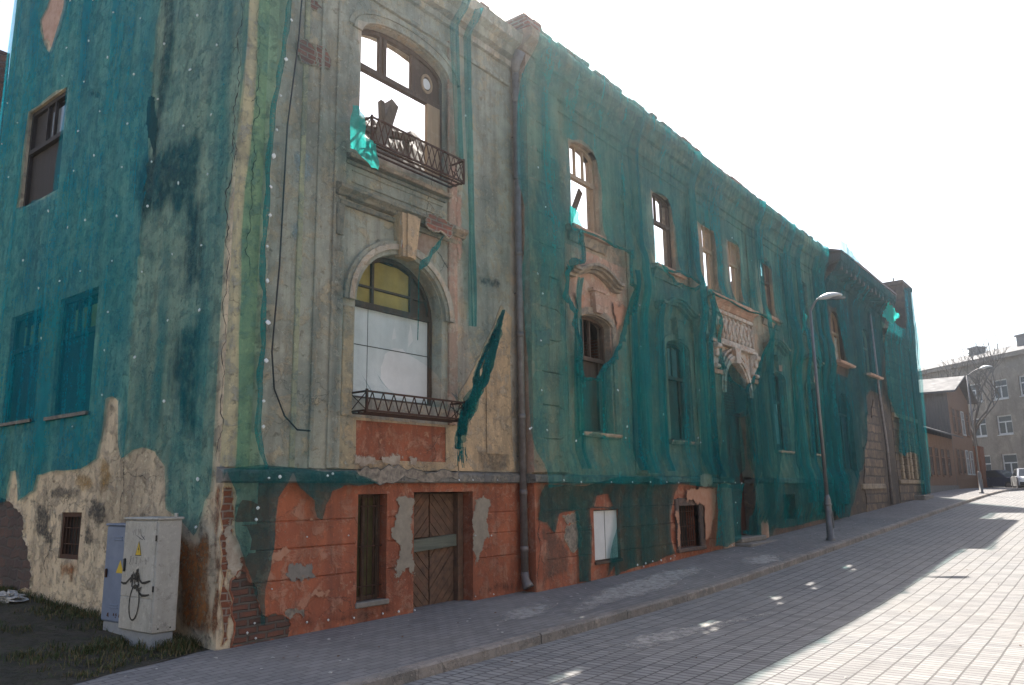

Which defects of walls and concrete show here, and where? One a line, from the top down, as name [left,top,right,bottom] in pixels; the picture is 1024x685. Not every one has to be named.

peeling [41,0,67,48]
spalling [296,38,332,69]
water stain [138,1,203,286]
crack [216,0,260,460]
water stain [173,330,198,432]
spalling [0,495,34,591]
spalling [218,485,305,648]
spalling [344,438,462,486]
peeling [391,496,415,582]
peeling [472,496,491,567]
peeling [675,473,716,547]
flaking render [863,400,888,512]